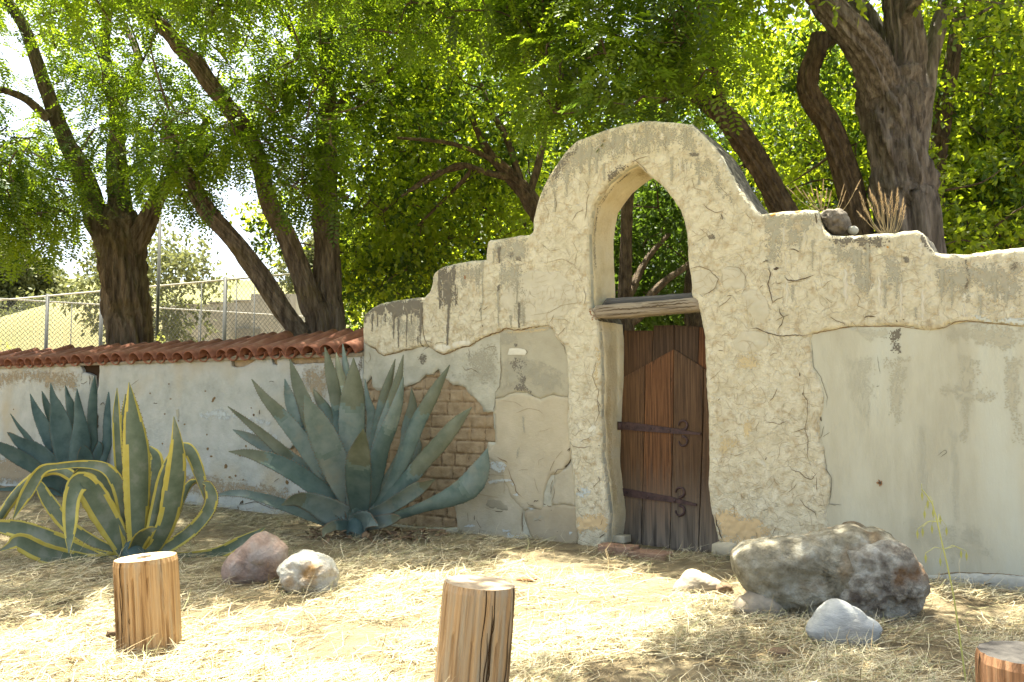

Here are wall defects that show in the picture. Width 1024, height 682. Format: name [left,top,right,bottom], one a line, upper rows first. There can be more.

damp [364,298,427,365]
spalling [384,371,495,527]
damp [437,237,567,396]
crack [694,260,1015,538]